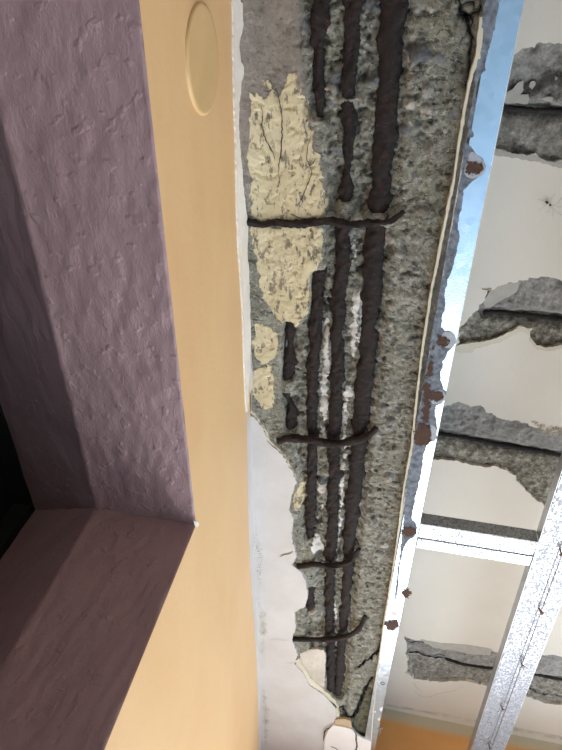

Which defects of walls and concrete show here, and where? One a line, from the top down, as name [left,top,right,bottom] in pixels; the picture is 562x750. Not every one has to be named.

crack [261,83,283,173]
spalling [494,42,562,168]
crack [291,143,318,219]
rust [463,158,484,176]
spalling [456,277,562,353]
spalling [239,0,481,750]
rust [413,334,450,446]
spalling [434,402,562,506]
rust [400,526,417,538]
rust [384,621,399,631]
spalling [406,637,503,686]
spalling [527,655,562,703]